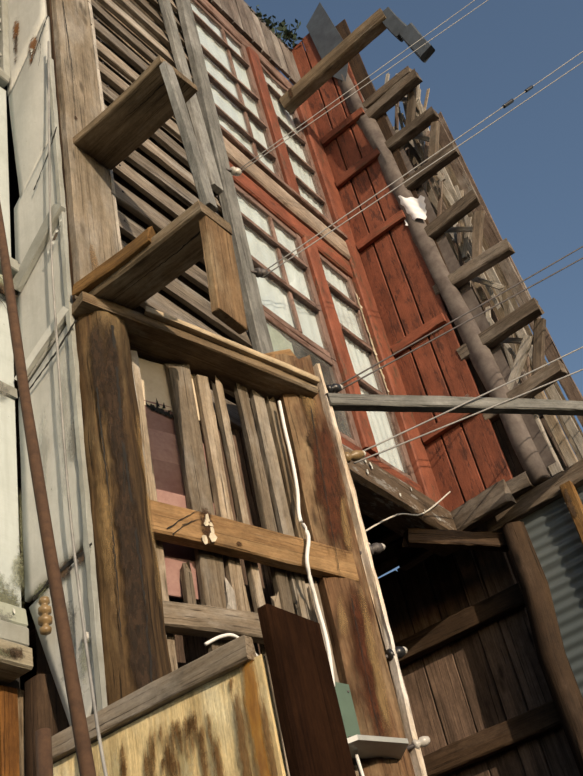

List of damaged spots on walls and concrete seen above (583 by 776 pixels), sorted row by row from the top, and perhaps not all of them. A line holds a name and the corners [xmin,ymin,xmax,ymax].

rust [29,34,38,63]
leakage [0,494,25,607]
rust [234,661,278,776]